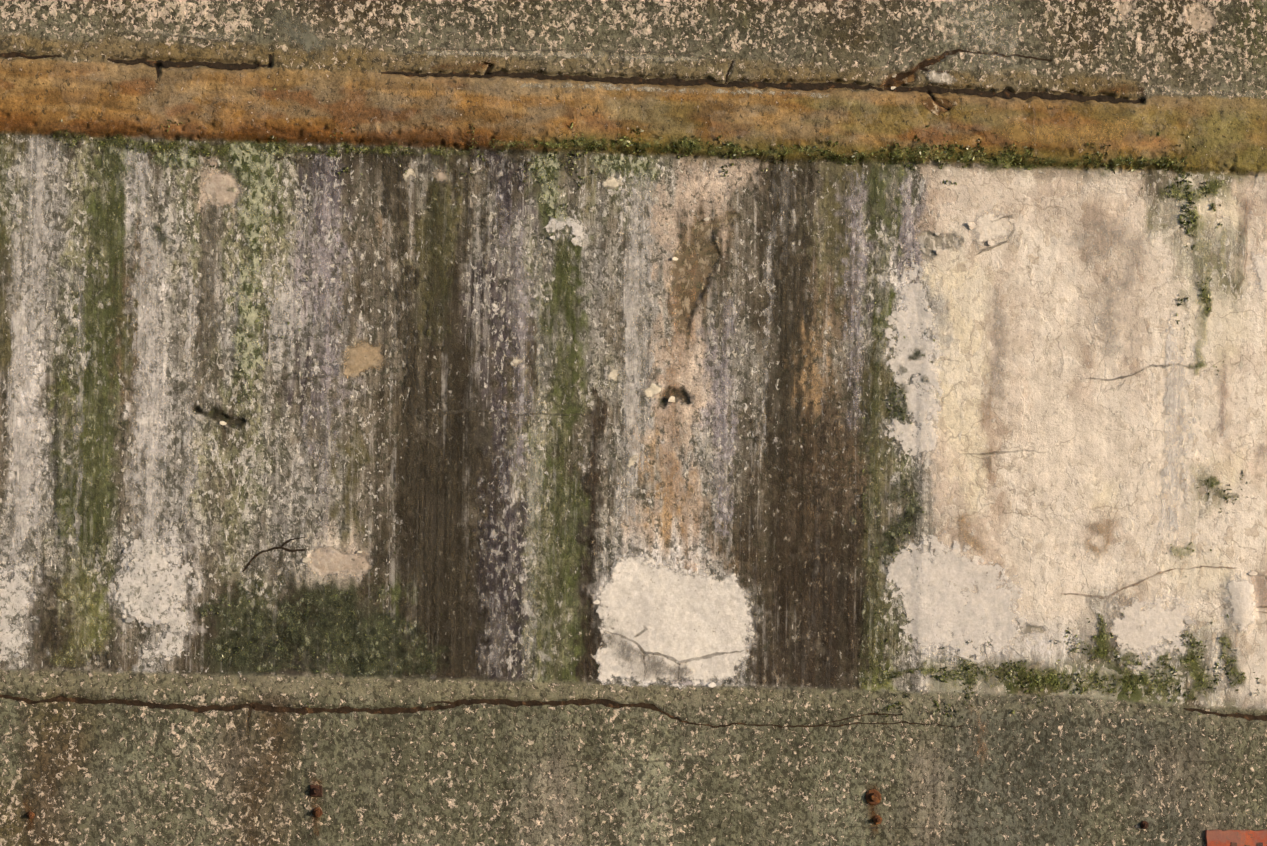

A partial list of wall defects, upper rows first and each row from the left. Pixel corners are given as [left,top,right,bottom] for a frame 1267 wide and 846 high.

crack [107,33,272,81]
crack [381,48,1146,128]
leakage [5,309,51,575]
leakage [130,283,167,555]
spalling [192,405,246,429]
leakage [375,147,575,678]
leakage [575,189,690,679]
spalling [644,383,690,406]
peeling [593,555,755,689]
peeling [886,535,1044,663]
crack [0,694,963,741]
crack [1184,708,1267,721]